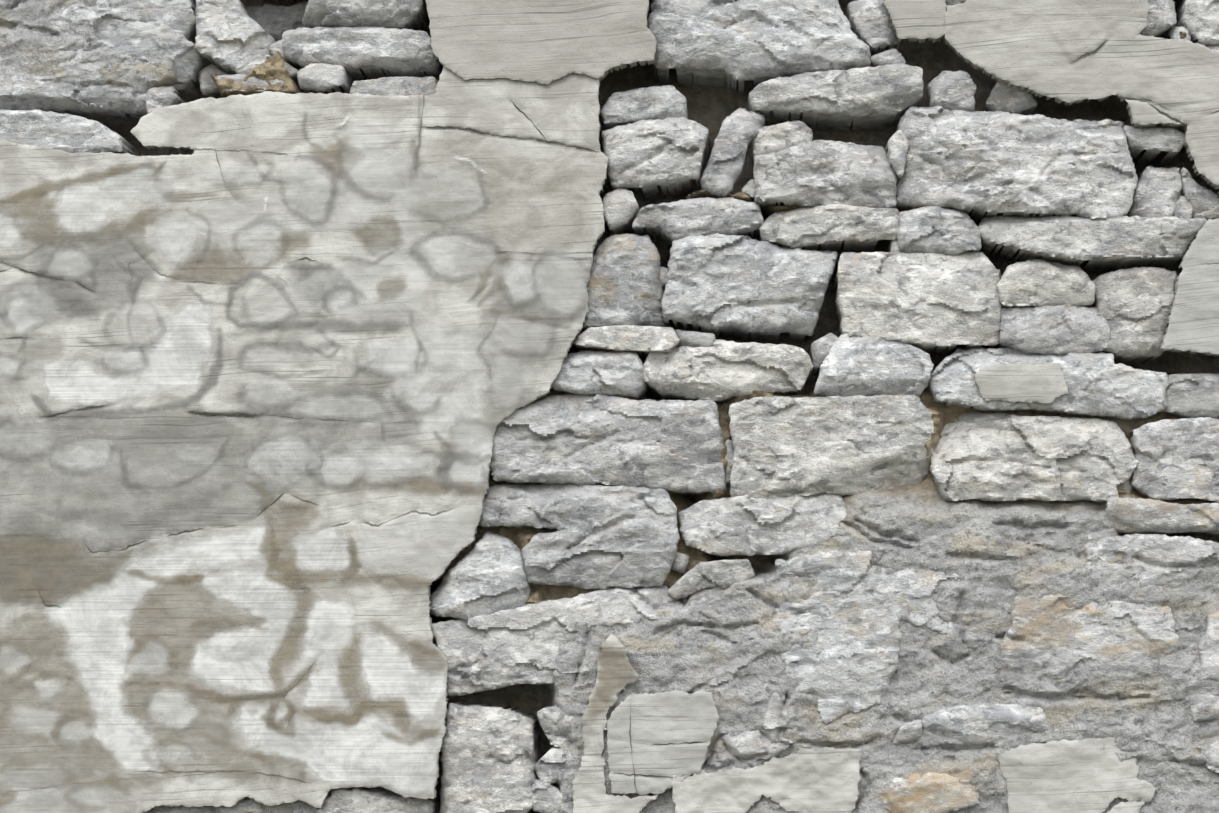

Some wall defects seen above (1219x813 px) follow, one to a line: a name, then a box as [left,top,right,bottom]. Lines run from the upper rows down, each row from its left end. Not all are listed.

crack [414,94,598,177]
peeling [883,0,1219,194]
crack [0,263,96,294]
peeling [1159,218,1219,356]
crack [43,405,110,417]
crack [185,411,376,423]
peeling [0,0,657,813]
leakage [329,344,482,492]
crack [83,492,453,585]
leakage [22,507,446,793]
peeling [572,634,862,813]
peeling [996,737,1158,813]